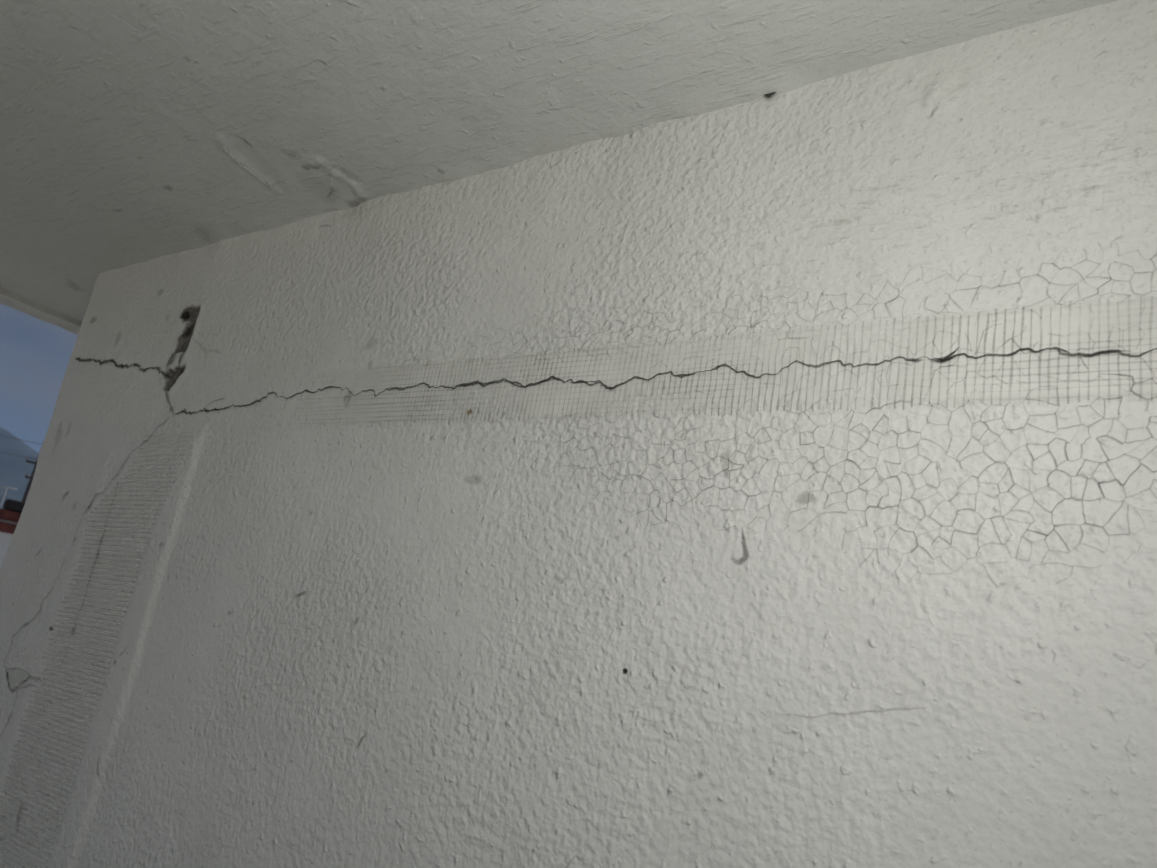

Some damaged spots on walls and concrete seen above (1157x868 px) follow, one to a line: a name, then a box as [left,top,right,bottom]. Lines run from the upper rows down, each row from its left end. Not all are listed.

crack [76,358,170,377]
flaking render [164,306,200,391]
crack [174,347,1157,415]
crack [1009,428,1103,501]